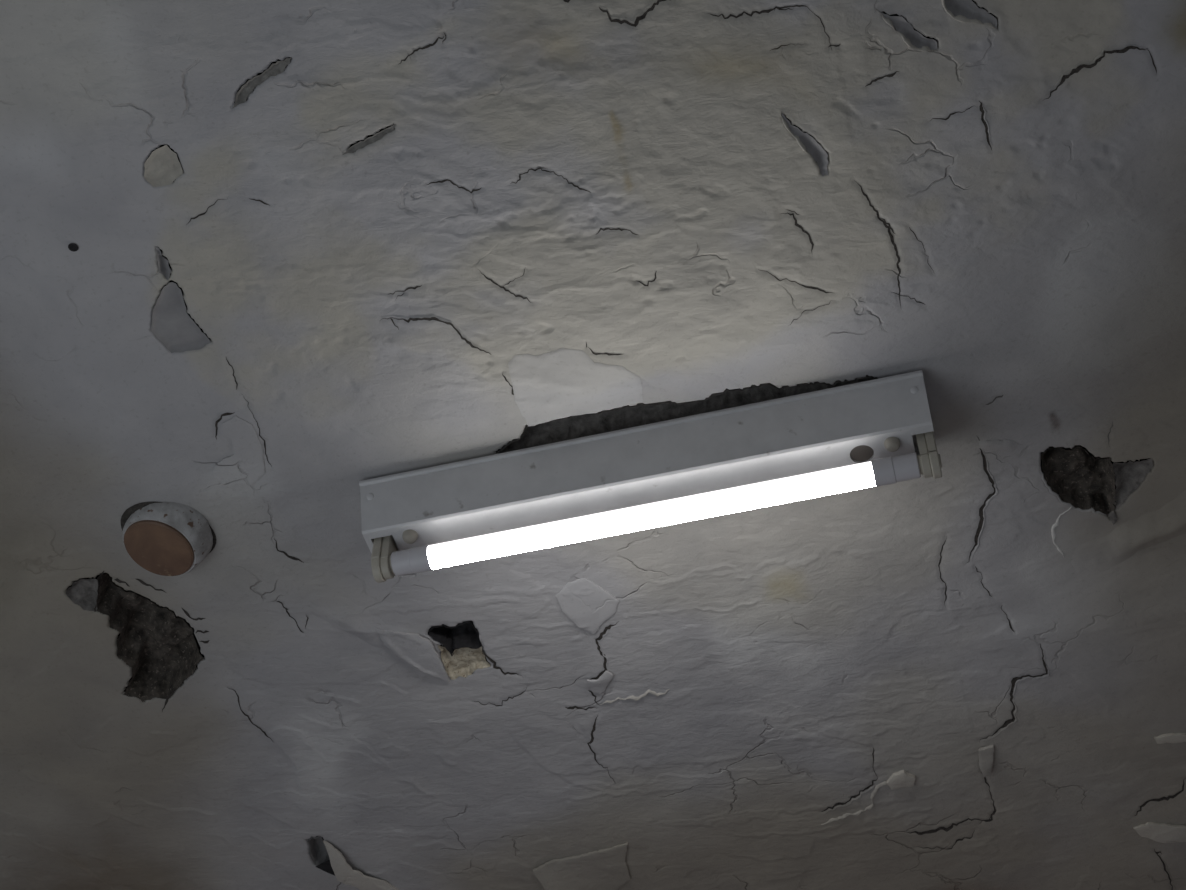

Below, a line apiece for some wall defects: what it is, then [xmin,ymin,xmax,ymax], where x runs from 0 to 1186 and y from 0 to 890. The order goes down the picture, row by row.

crack [711,5,840,51]
crack [1044,44,1157,100]
crack [855,181,934,306]
spalling [151,247,211,353]
crack [383,285,514,395]
spalling [497,375,878,453]
crack [938,438,1013,631]
spalling [1040,445,1153,525]
spalling [66,571,209,712]
flaking render [375,621,490,683]
crack [565,621,670,781]
flaking render [307,836,399,890]